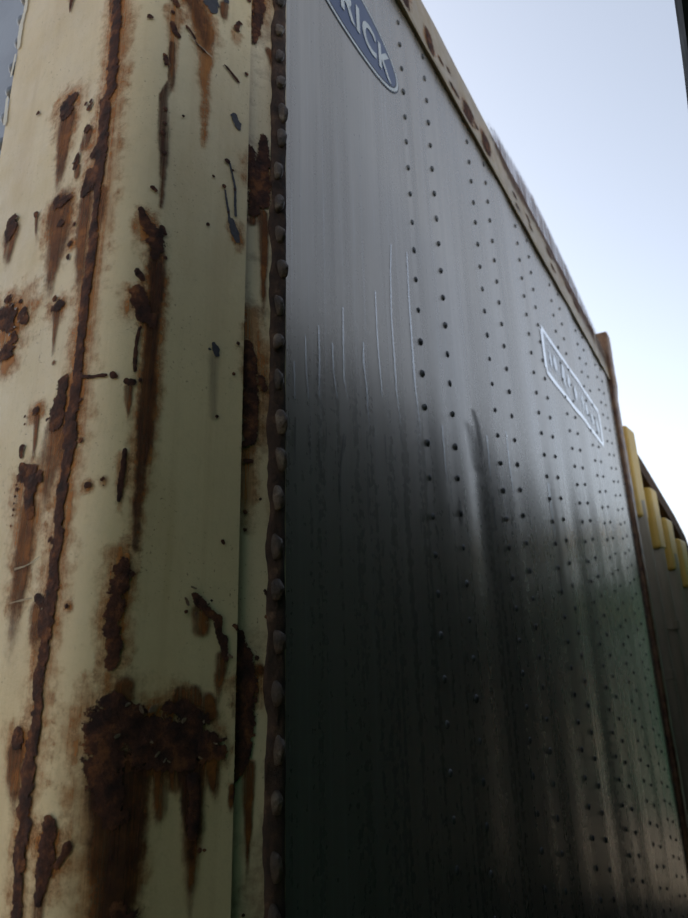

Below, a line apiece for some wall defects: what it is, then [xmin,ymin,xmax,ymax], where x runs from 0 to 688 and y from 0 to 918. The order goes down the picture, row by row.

rust [34,90,88,365]
peeling [163,0,243,143]
rust [232,134,272,514]
rust [247,0,272,65]
rust [425,26,607,363]
rust [63,41,264,918]
rust [33,815,72,918]